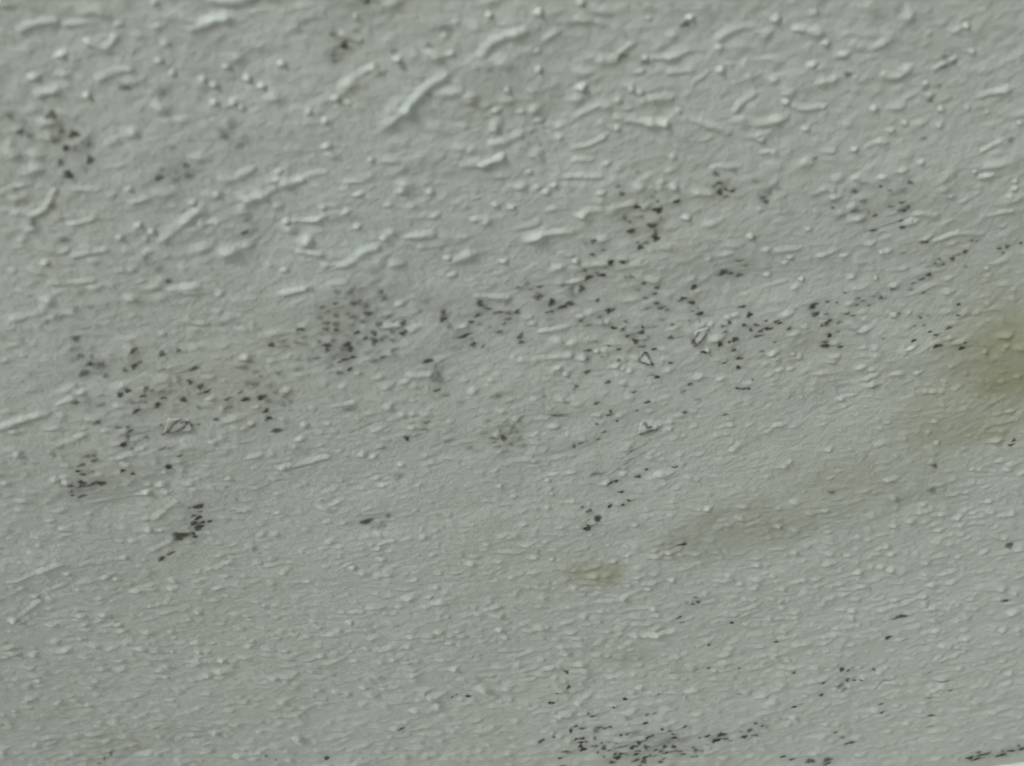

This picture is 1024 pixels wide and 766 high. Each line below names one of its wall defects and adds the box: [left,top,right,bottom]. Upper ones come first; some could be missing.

damp [634,201,662,250]
damp [338,302,381,374]
damp [718,305,791,369]
damp [810,292,846,348]
damp [174,504,212,540]
damp [559,713,764,766]